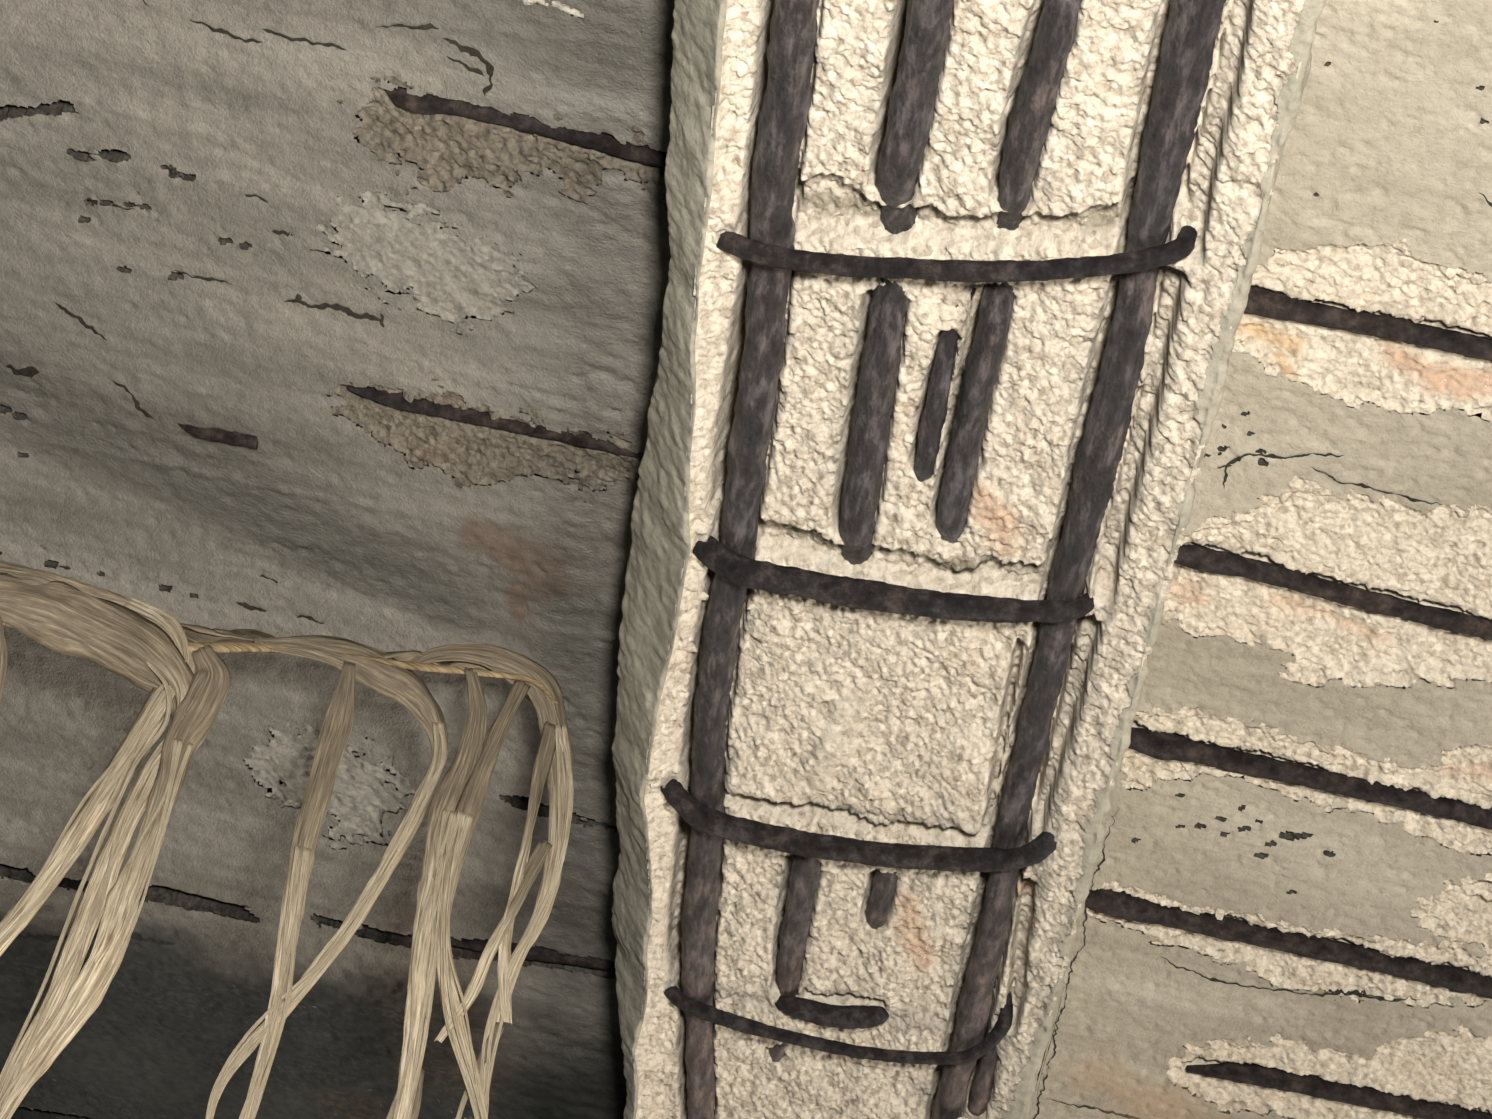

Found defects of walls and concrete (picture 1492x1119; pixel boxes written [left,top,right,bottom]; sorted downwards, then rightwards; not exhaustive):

peeling [523,0,584,18]
spalling [310,75,667,334]
spalling [326,379,645,502]
crack [1218,445,1441,505]
spalling [632,0,1492,1119]
peeling [244,723,320,808]
peeling [324,737,416,849]
spalling [499,794,549,818]
spalling [310,913,413,948]
spalling [450,936,616,979]
crack [1033,807,1140,1119]
crack [1162,957,1420,1002]